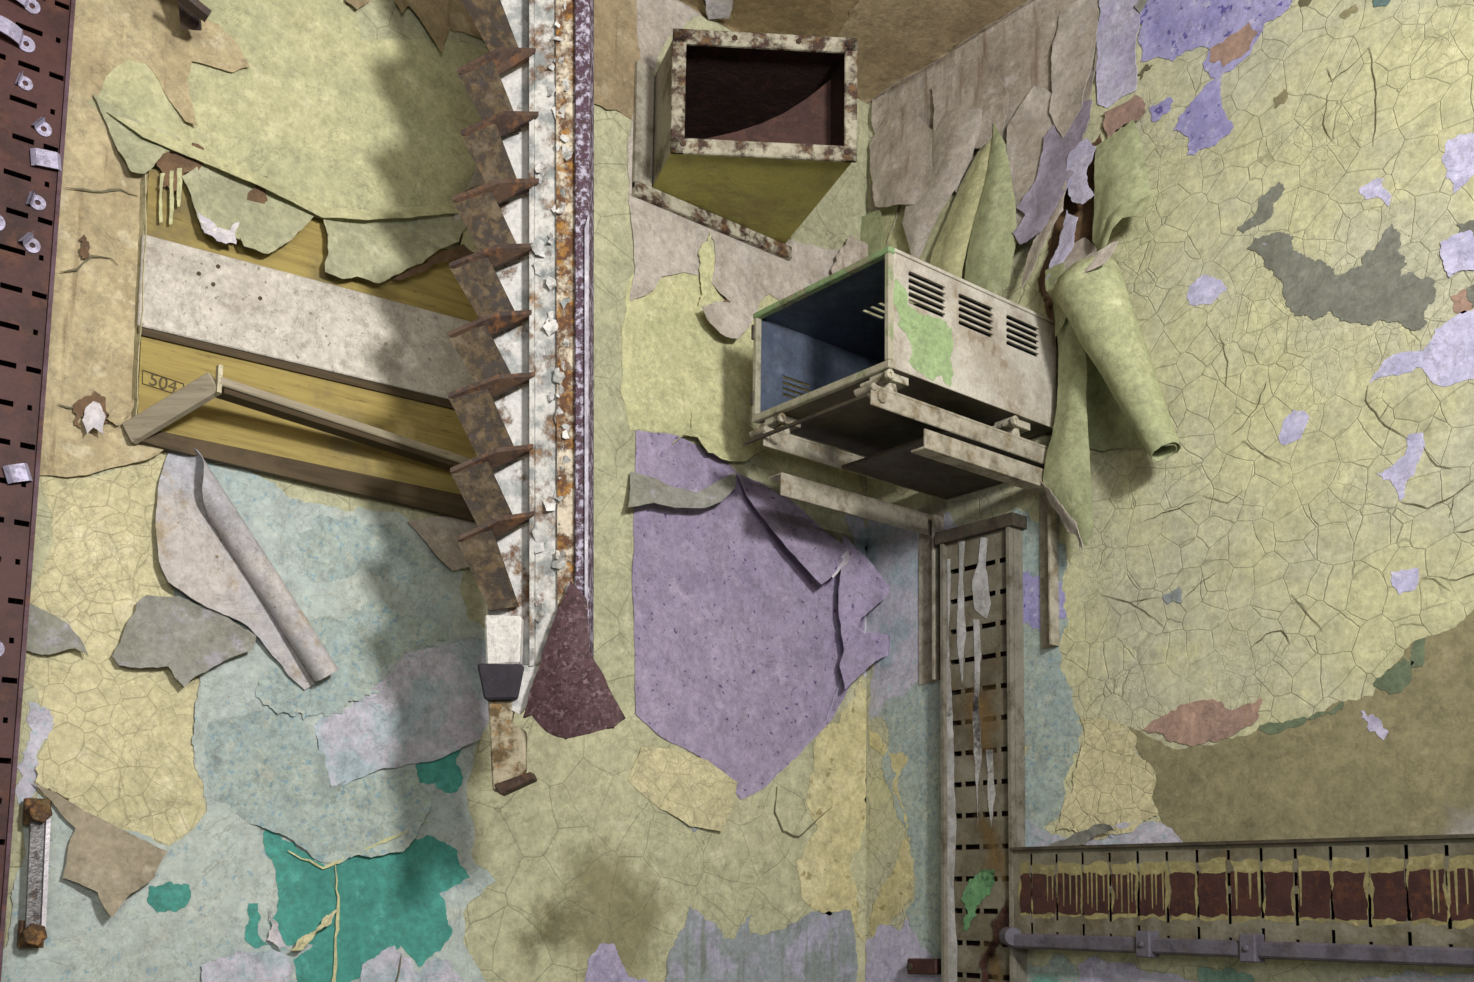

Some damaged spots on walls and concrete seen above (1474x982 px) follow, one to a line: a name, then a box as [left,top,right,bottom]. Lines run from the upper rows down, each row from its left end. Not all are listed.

crack [1323,49,1377,146]
peeling [1,0,496,982]
peeling [585,0,1474,982]
crack [1145,491,1243,521]
crack [1232,384,1280,463]
crack [1365,387,1474,532]
crack [1104,573,1215,625]
crack [1251,595,1322,653]